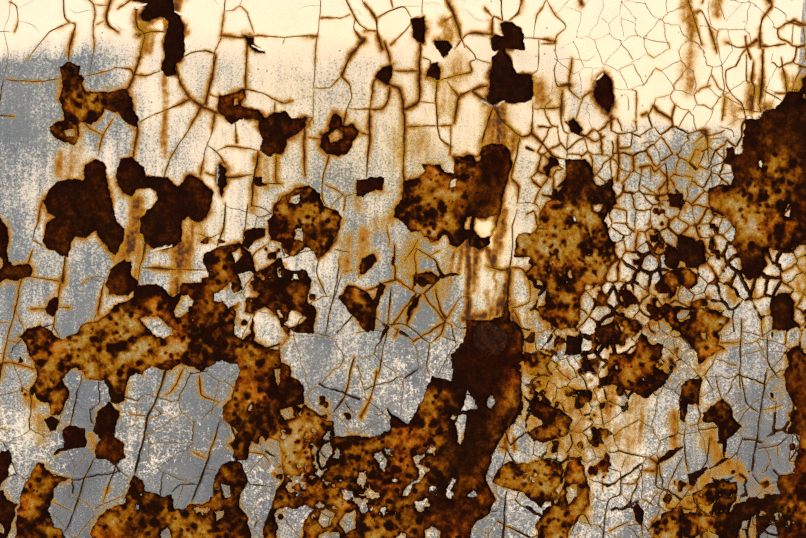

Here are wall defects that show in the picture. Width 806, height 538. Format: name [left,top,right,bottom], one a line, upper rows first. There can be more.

crack [0,202,105,381]
corrosion [111,195,146,279]
crack [102,367,220,503]
corrosion [168,222,226,297]
peeling [215,87,363,158]
crack [0,0,672,338]
peeling [17,141,748,538]
peeling [480,21,535,107]
corrosion [435,196,806,521]
corrosion [679,0,696,94]
crack [683,0,806,186]
peeling [706,73,806,289]